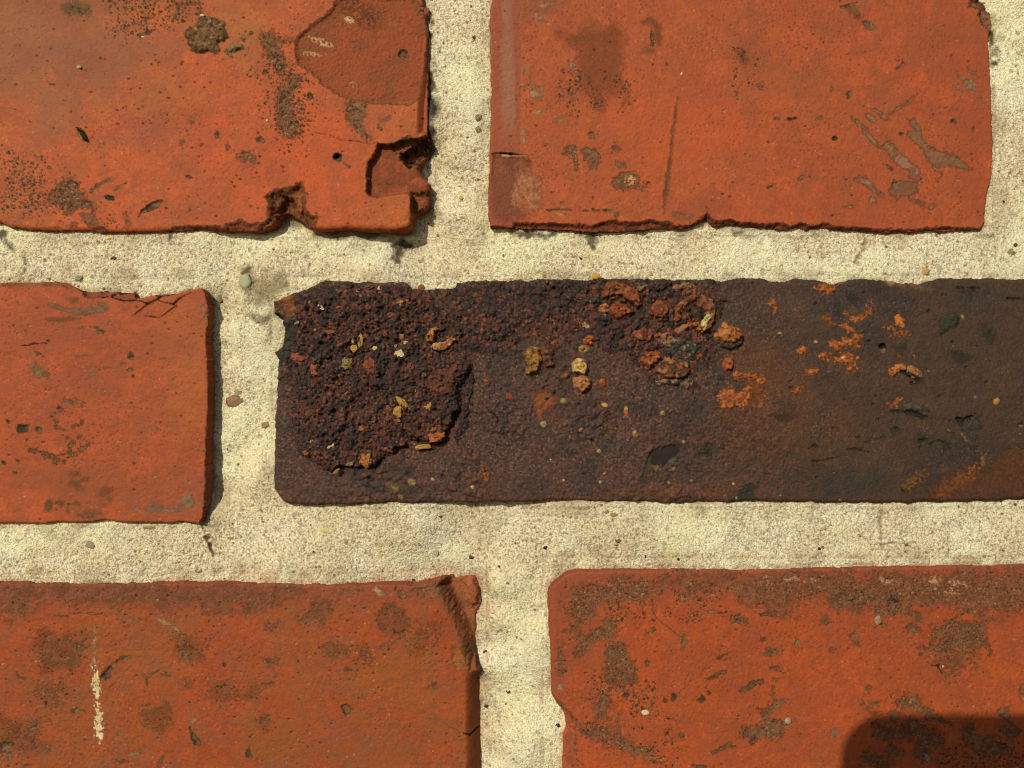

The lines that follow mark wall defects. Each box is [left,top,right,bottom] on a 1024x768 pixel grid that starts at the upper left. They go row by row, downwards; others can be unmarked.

spalling [214,0,430,214]
spalling [491,156,976,233]
crack [112,292,191,317]
peeling [387,284,425,318]
spalling [274,284,380,380]
peeling [394,334,414,370]
peeling [425,326,457,357]
peeling [384,374,431,423]
peeling [414,427,445,450]
peeling [332,453,371,477]
spalling [380,574,481,674]